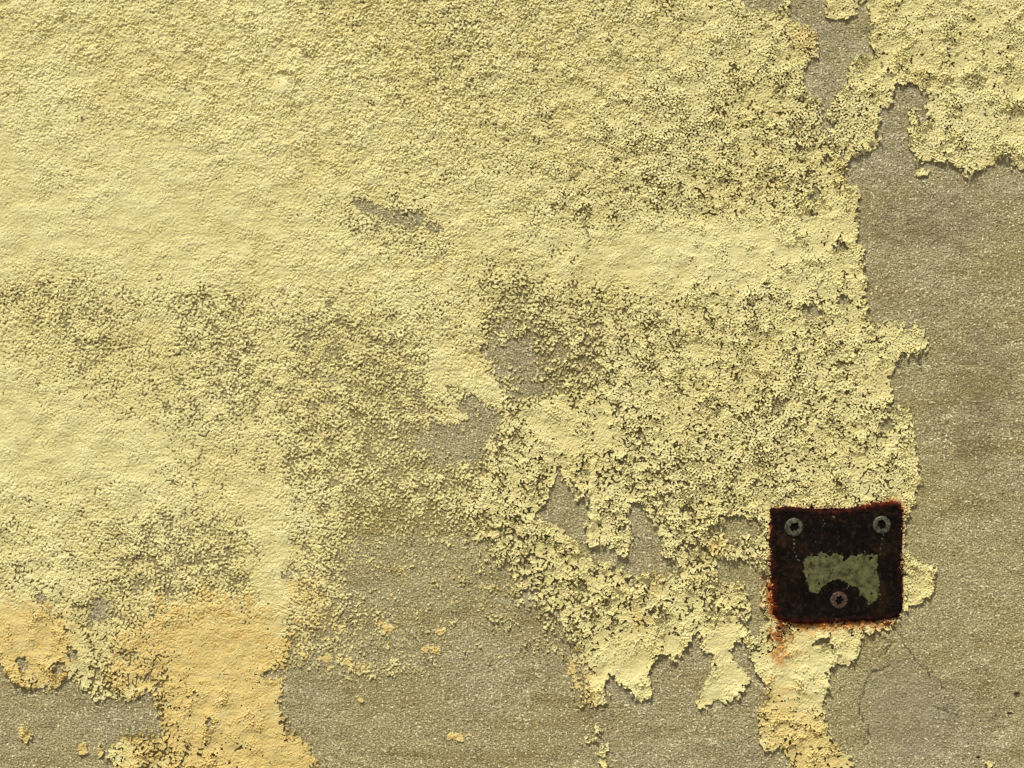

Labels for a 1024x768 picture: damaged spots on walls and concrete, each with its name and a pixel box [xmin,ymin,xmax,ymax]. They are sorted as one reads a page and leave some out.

peeling [832,237,850,255]
peeling [490,276,526,300]
peeling [545,353,578,380]
peeling [367,433,386,453]
peeling [390,444,441,533]
rust [761,499,905,642]
peeling [0,646,162,768]